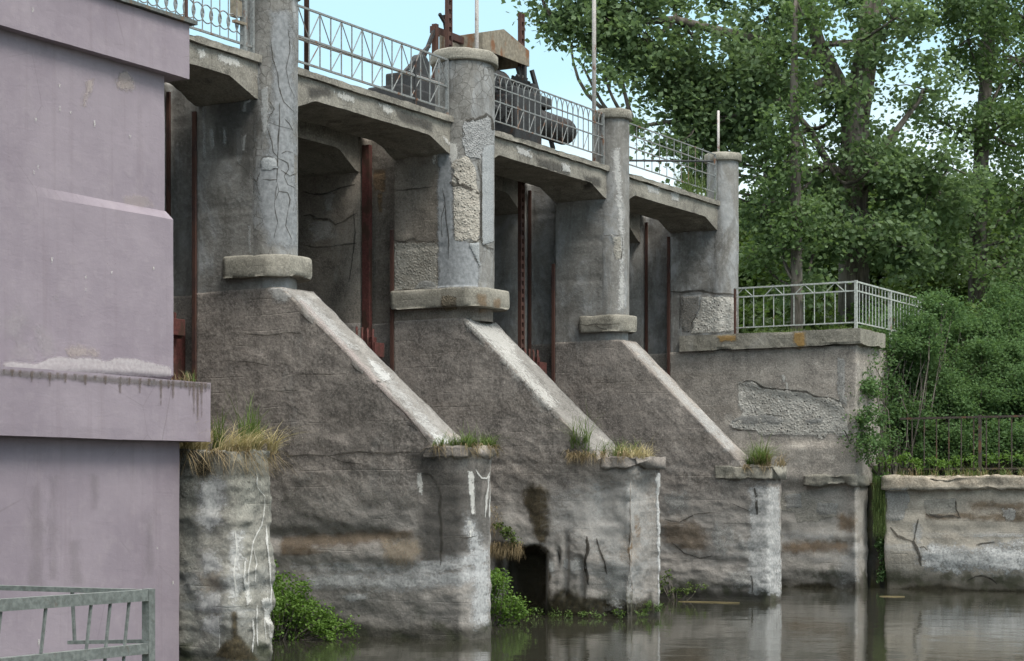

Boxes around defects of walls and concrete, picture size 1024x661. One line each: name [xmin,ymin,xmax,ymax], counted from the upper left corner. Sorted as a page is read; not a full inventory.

crack [239,31,356,280]
spalling [452,116,494,266]
spalling [681,296,737,333]
peeling [4,357,171,378]
leakage [4,371,210,387]
spalling [730,357,850,439]
leakage [196,456,227,531]
leakage [198,473,273,661]
leakage [309,470,660,624]
crack [558,536,608,585]
crack [890,501,961,566]